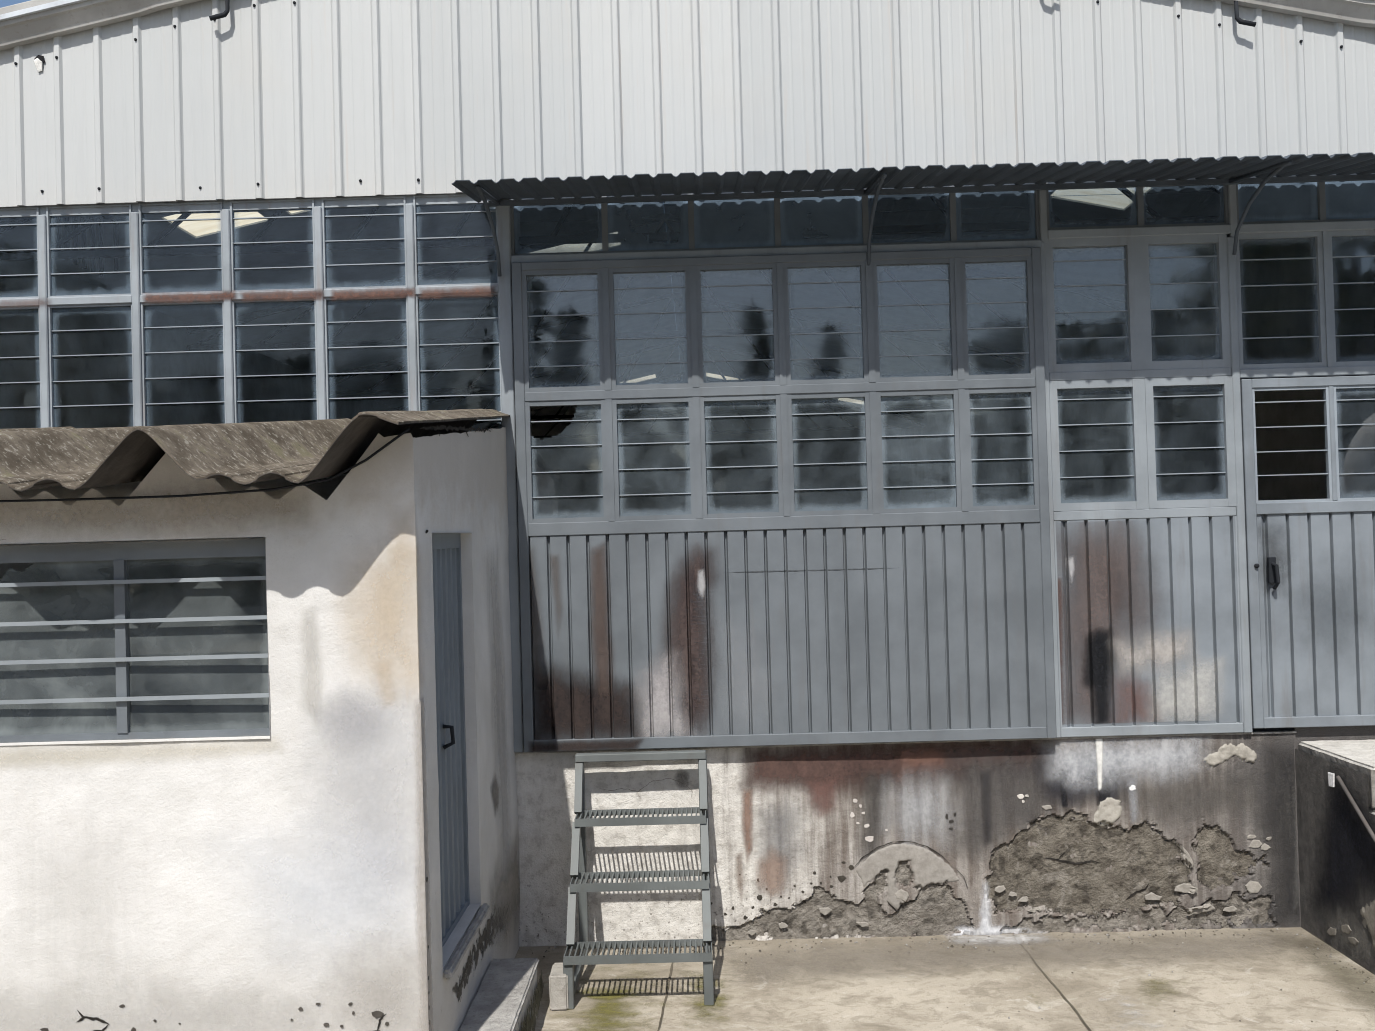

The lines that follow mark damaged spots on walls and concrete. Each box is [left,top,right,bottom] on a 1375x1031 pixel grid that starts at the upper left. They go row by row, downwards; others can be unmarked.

peeling [453,902,509,1001]
spalling [711,861,974,941]
corrosion [738,741,1051,888]
spalling [987,794,1277,934]